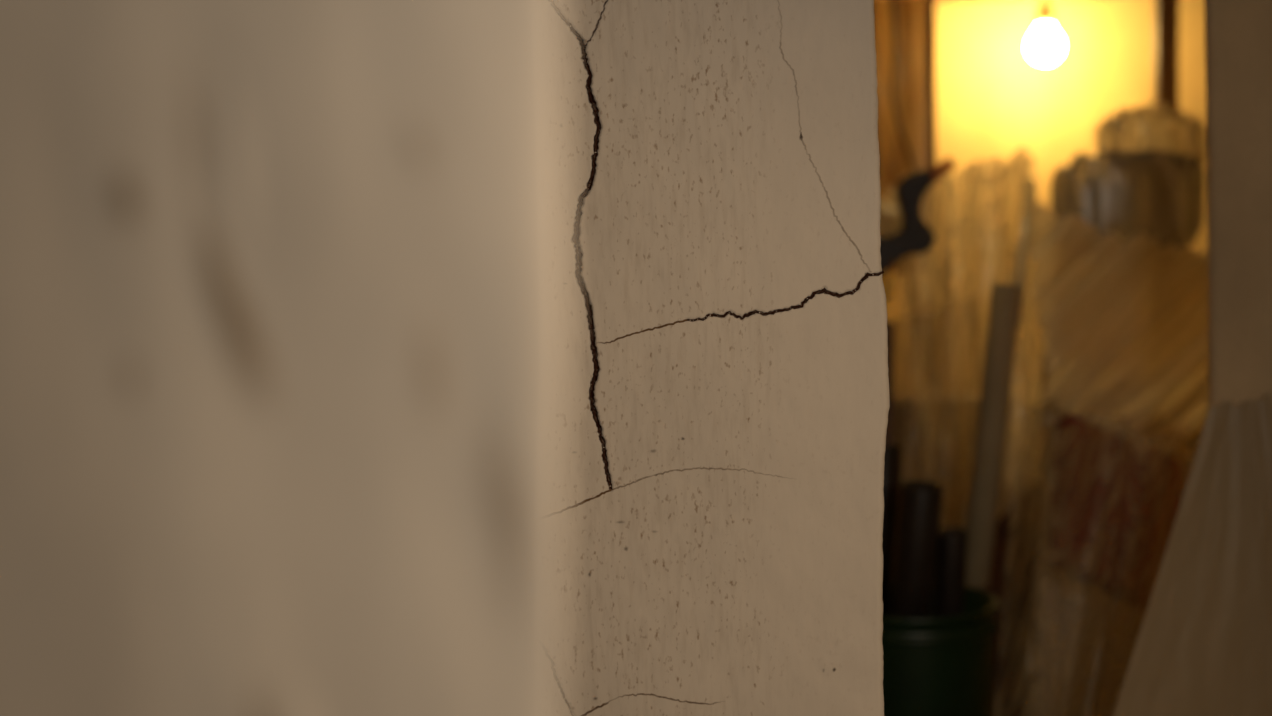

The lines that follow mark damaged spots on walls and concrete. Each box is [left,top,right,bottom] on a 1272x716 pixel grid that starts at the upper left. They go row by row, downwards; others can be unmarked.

crack [560,0,884,512]
crack [563,692,707,716]